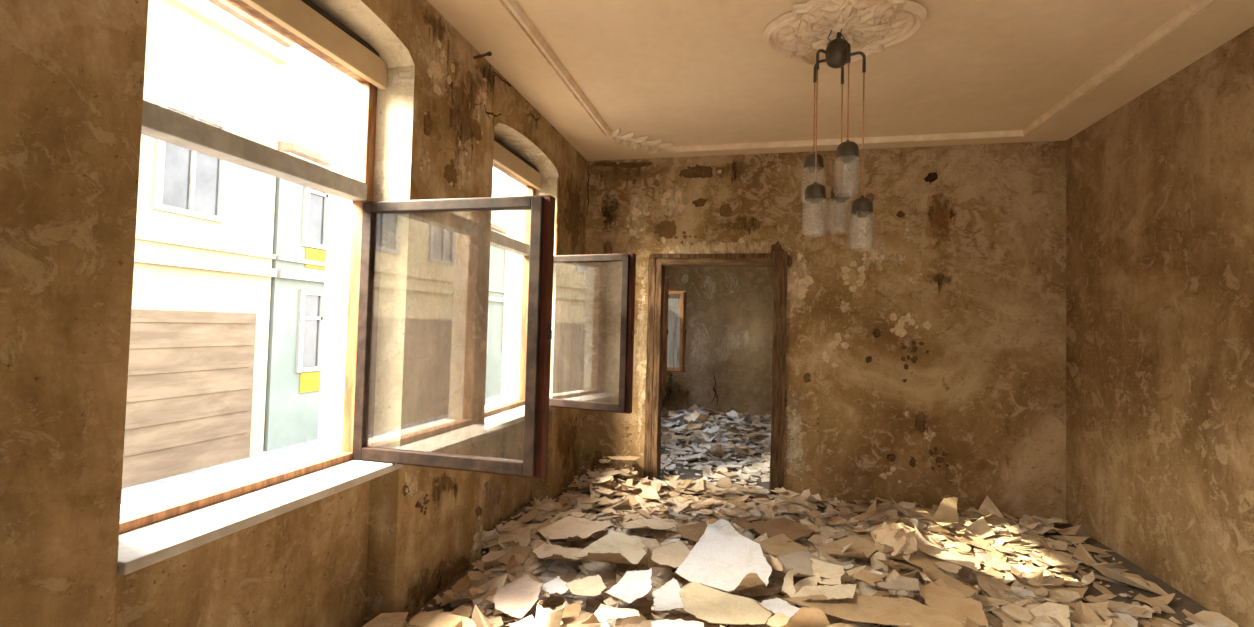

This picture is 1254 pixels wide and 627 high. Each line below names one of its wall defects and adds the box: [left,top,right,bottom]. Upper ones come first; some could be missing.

flaking render [415,24,490,196]
flaking render [625,164,814,316]
flaking render [840,215,888,313]
flaking render [822,333,850,368]
flaking render [871,312,932,383]